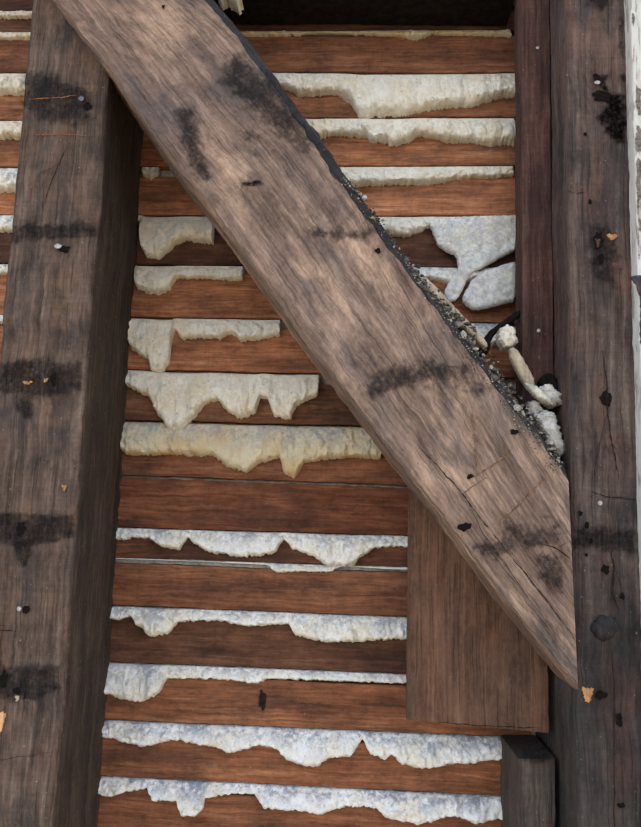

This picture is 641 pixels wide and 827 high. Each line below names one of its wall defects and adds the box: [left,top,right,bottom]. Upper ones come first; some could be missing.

crack [417,443,574,638]